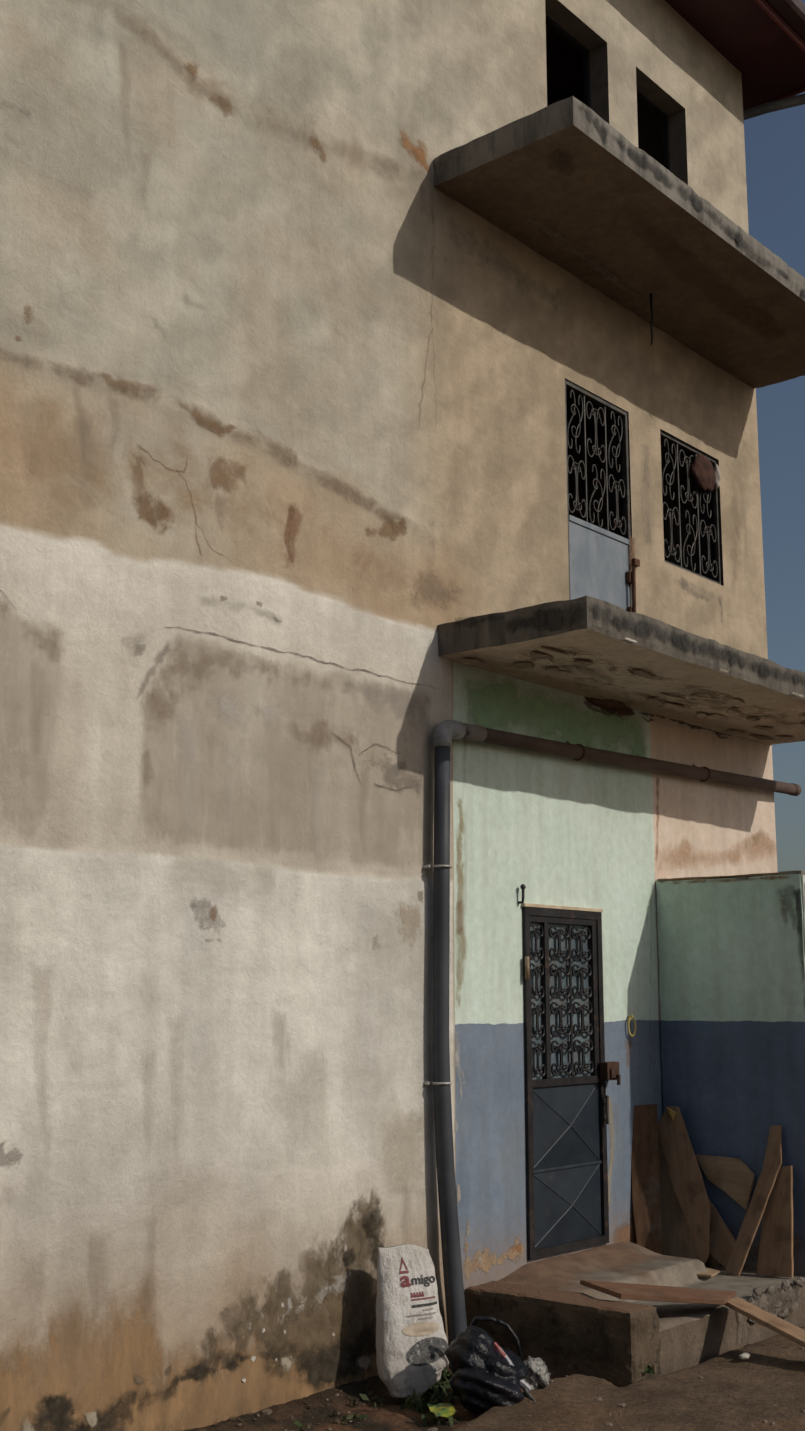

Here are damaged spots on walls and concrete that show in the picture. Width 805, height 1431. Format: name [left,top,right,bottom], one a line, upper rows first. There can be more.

damp [194,410,250,439]
damp [139,499,171,525]
damp [366,518,406,536]
crack [167,627,435,689]
peeling [505,647,805,740]
crack [332,733,409,791]
damp [782,889,804,976]
peeling [463,1222,524,1278]
damp [0,1197,384,1431]